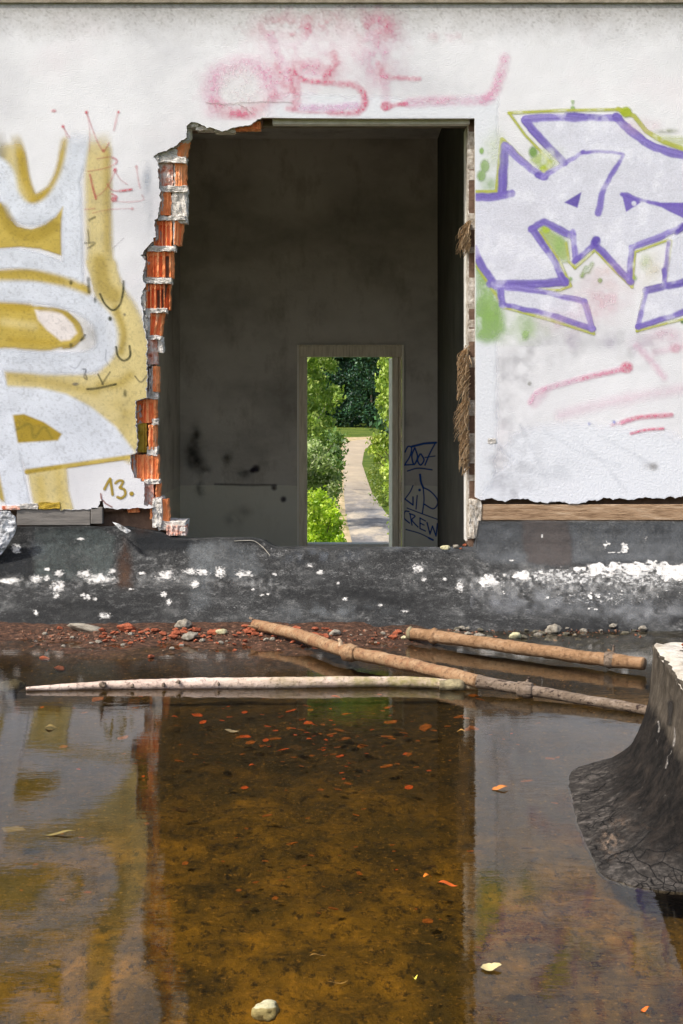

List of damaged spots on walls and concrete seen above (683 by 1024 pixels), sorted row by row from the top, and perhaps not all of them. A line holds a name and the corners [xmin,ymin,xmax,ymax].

spalling [127,121,261,536]
damp [492,576,593,609]
crack [608,831,683,884]